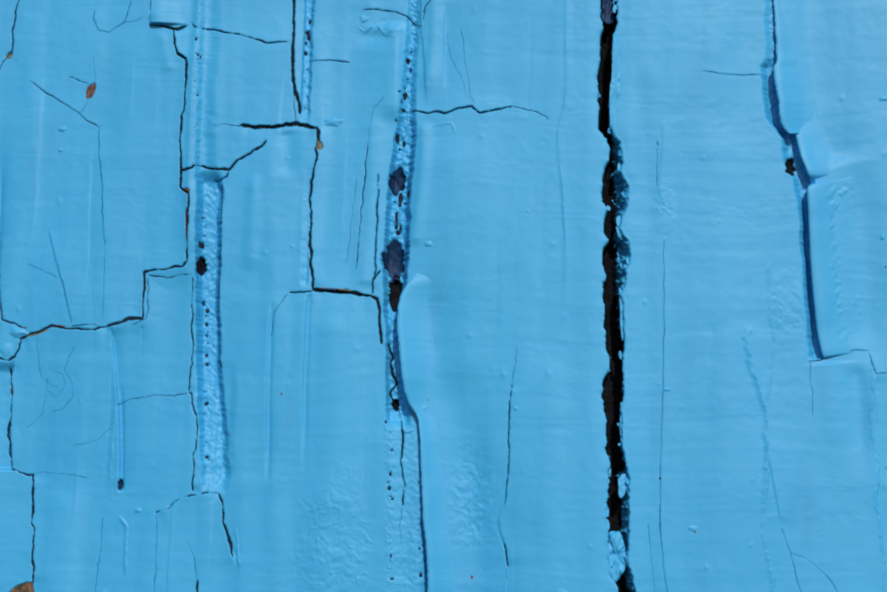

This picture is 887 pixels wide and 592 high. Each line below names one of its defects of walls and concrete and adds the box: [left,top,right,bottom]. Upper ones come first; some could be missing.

hole [394,188,409,236]
crack [0,0,415,592]
crack [809,359,824,414]
crack [781,528,837,592]